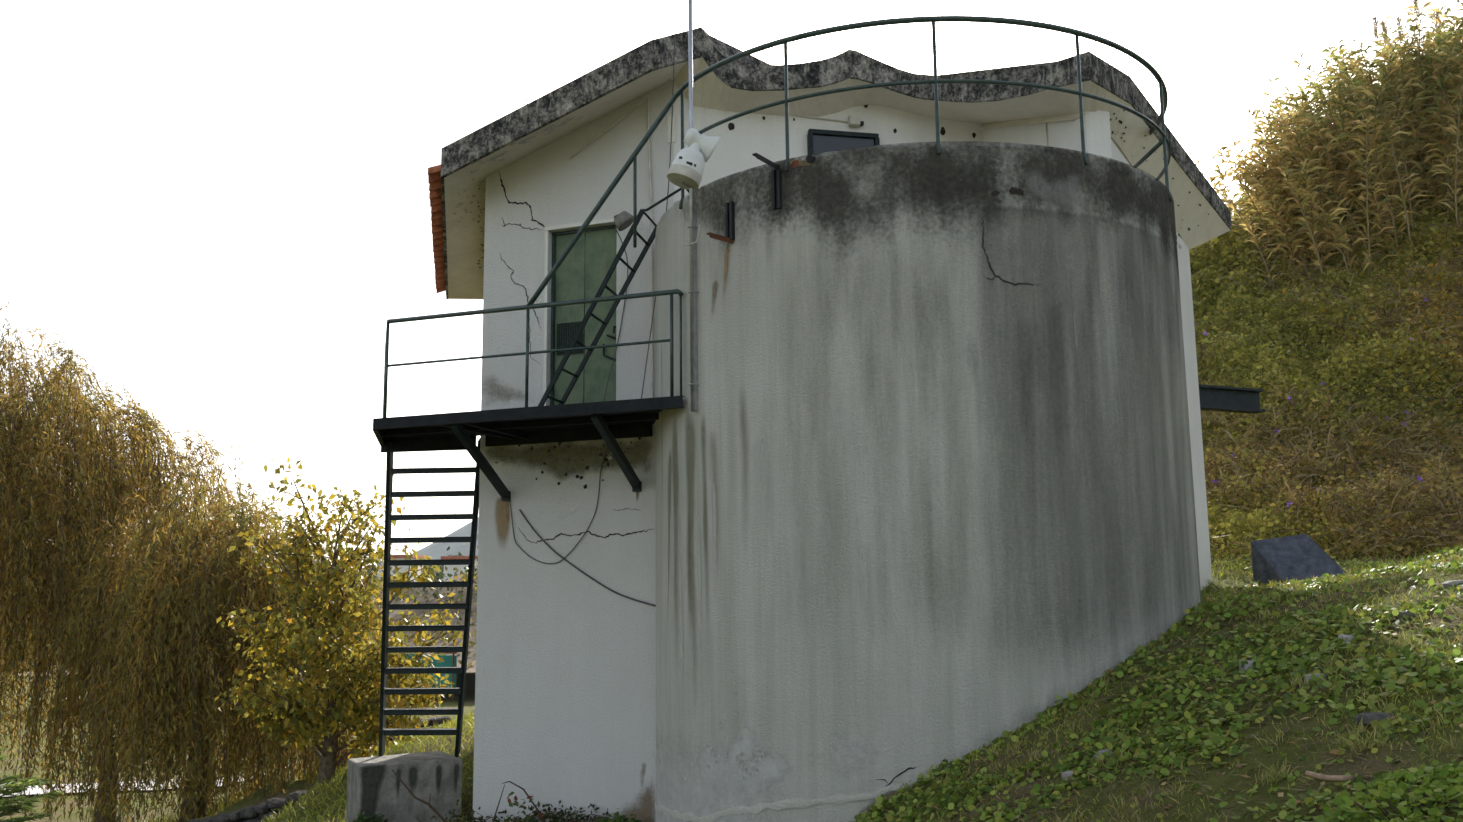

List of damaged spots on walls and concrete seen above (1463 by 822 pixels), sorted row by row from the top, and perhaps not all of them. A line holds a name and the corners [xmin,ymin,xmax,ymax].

crack [499,173,550,365]
crack [982,218,1040,286]
corrosion [497,499,509,539]
crack [877,766,917,787]